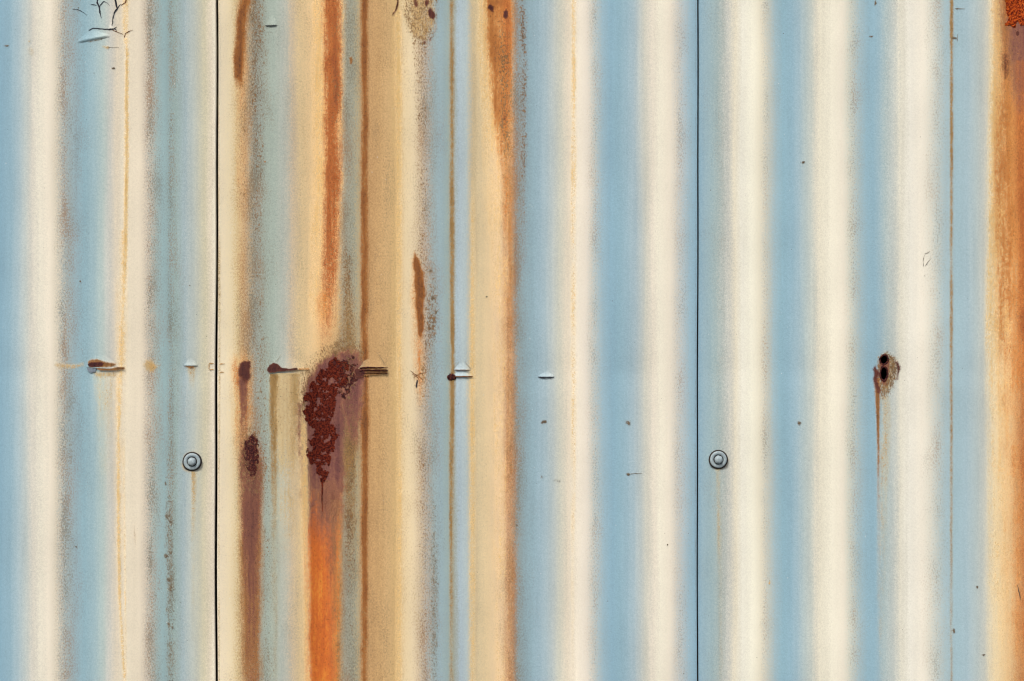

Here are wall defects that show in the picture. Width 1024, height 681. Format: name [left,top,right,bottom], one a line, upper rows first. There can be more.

crack [74,0,132,37]
corrosion [233,0,250,89]
corrosion [298,0,369,681]
corrosion [413,2,455,626]
corrosion [480,0,527,285]
corrosion [986,0,1024,410]
corrosion [233,361,267,681]